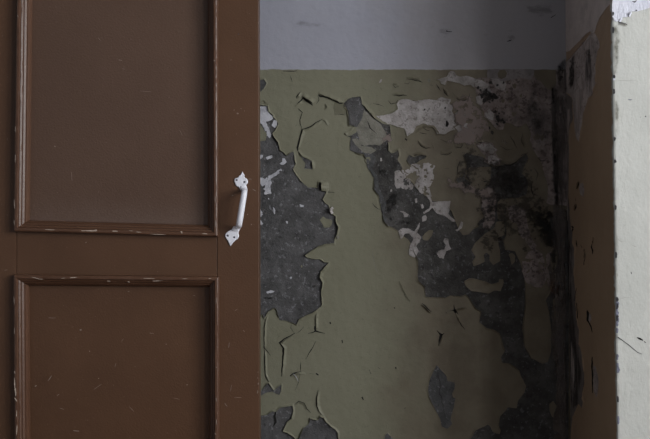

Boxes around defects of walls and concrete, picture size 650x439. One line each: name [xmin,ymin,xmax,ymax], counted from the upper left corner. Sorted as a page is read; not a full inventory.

crack [288,71,348,151]
peeling [253,100,341,327]
peeling [342,0,650,439]
leakage [530,60,585,439]
crack [398,281,467,328]
crack [264,313,325,413]
peeling [261,390,340,439]